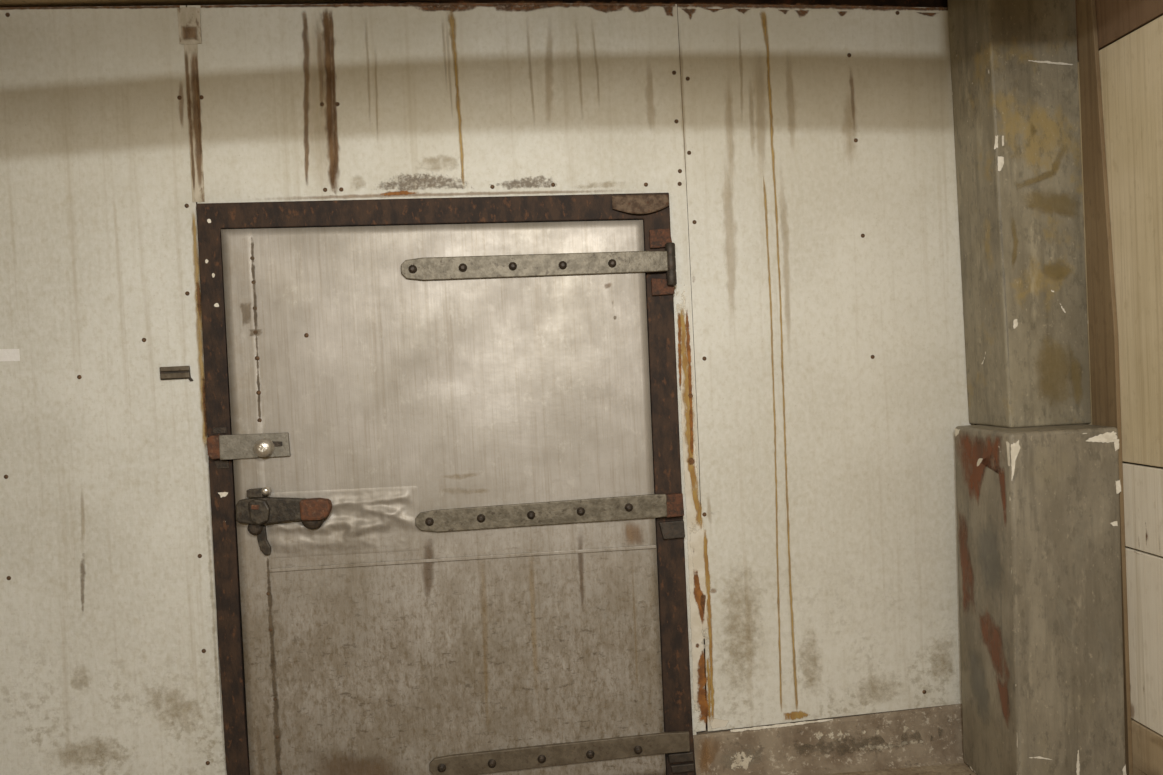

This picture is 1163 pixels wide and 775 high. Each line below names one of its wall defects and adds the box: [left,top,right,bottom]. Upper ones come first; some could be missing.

rust [183,27,196,39]
rust [185,56,201,186]
rust [192,219,207,442]
rust [201,1,948,723]
peeling [1083,431,1119,451]
rust [267,561,282,775]